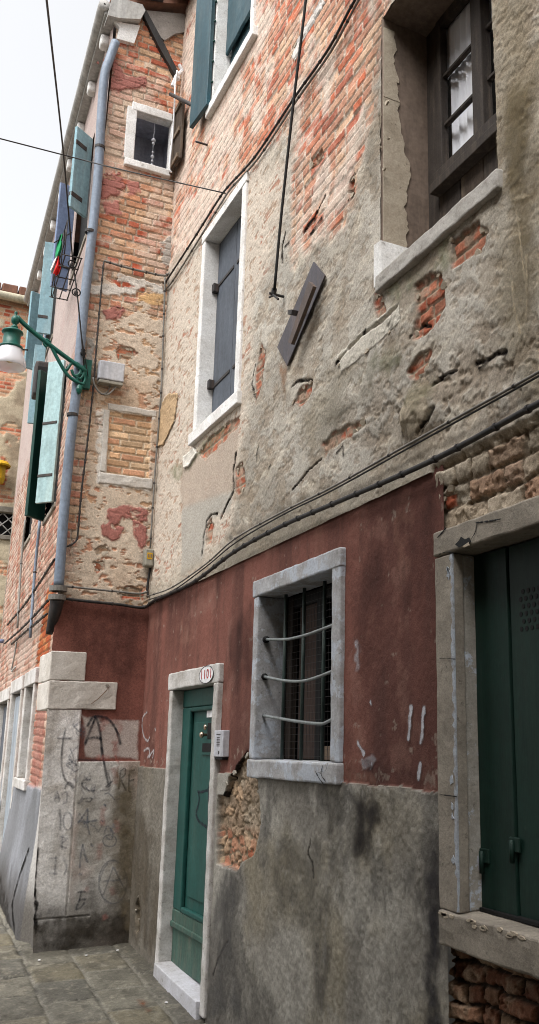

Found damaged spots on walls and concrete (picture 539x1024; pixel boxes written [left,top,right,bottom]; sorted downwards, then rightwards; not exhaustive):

spalling [309,149,324,170]
flaking render [378,27,411,247]
spalling [347,174,356,200]
spalling [413,222,489,340]
spalling [254,344,266,398]
spalling [408,349,432,381]
crack [201,446,271,554]
spalling [443,485,458,512]
spalling [219,752,261,870]
water stain [354,802,379,855]
water stain [426,872,440,1024]